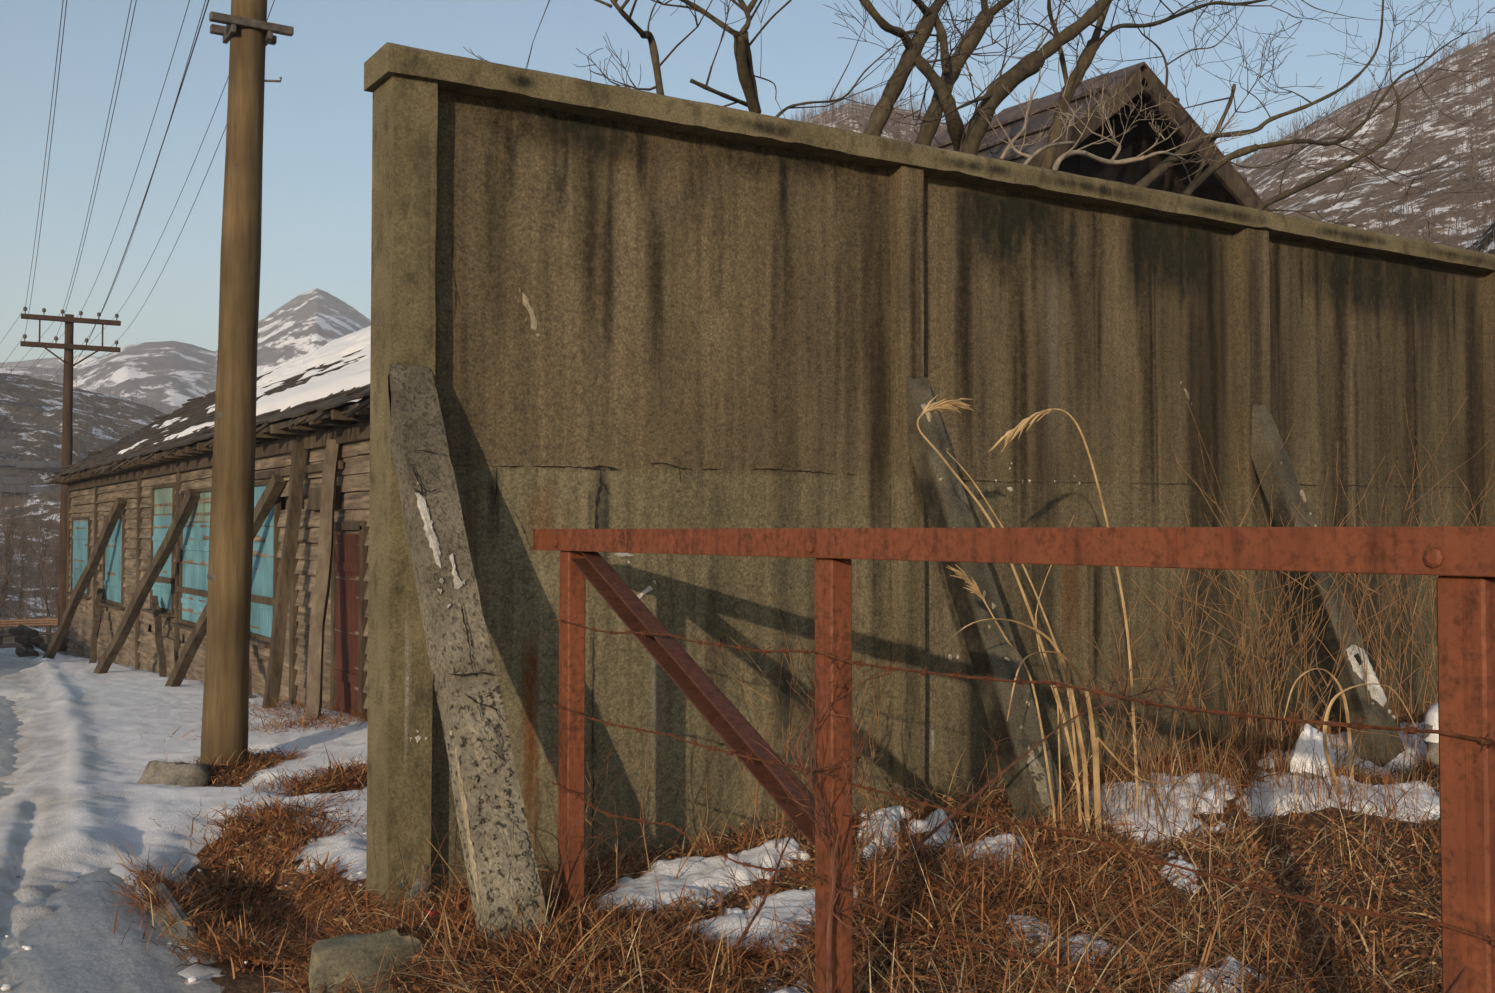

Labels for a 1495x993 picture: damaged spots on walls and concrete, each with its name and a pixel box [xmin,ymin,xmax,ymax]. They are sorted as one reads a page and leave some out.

damp [958,201,968,346]
crack [407,450,717,529]
crack [754,464,854,475]
damp [938,562,1015,765]
damp [1290,571,1359,703]